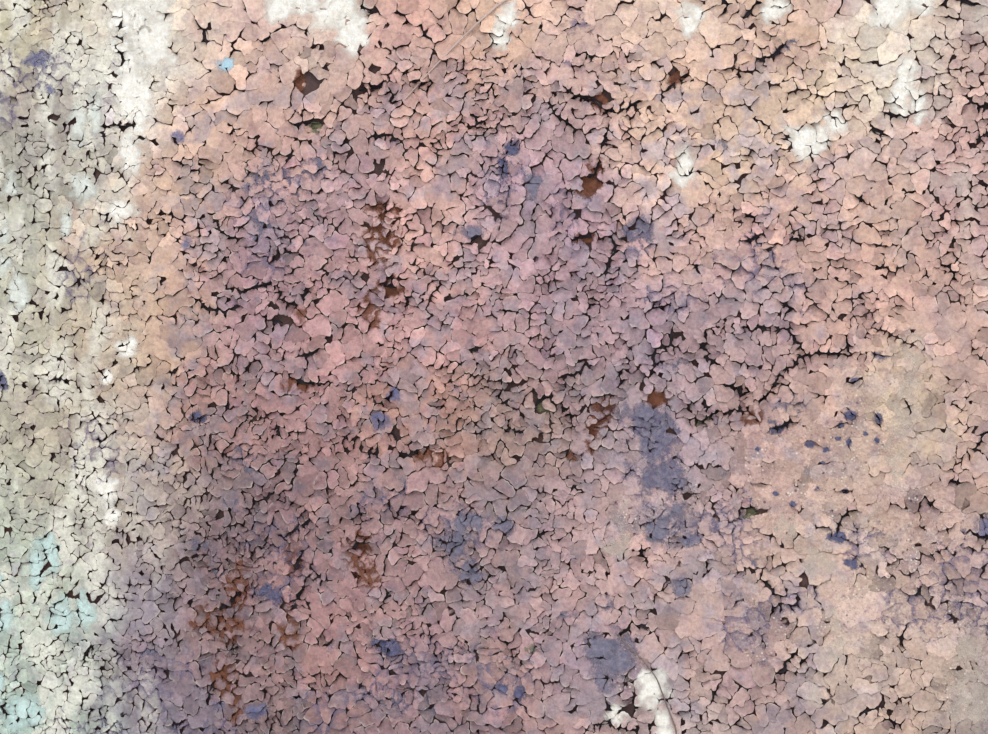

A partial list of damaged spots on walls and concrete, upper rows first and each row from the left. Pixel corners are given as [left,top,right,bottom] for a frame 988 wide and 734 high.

crack [363,0,432,40]
crack [722,0,762,19]
crack [102,122,136,141]
crack [547,86,641,178]
crack [871,112,900,137]
crack [197,248,328,324]
peeling [0,0,988,542]
crack [571,232,618,309]
crack [688,301,851,424]
peeling [198,159,988,668]
peeling [0,513,300,734]
peeling [132,473,988,734]